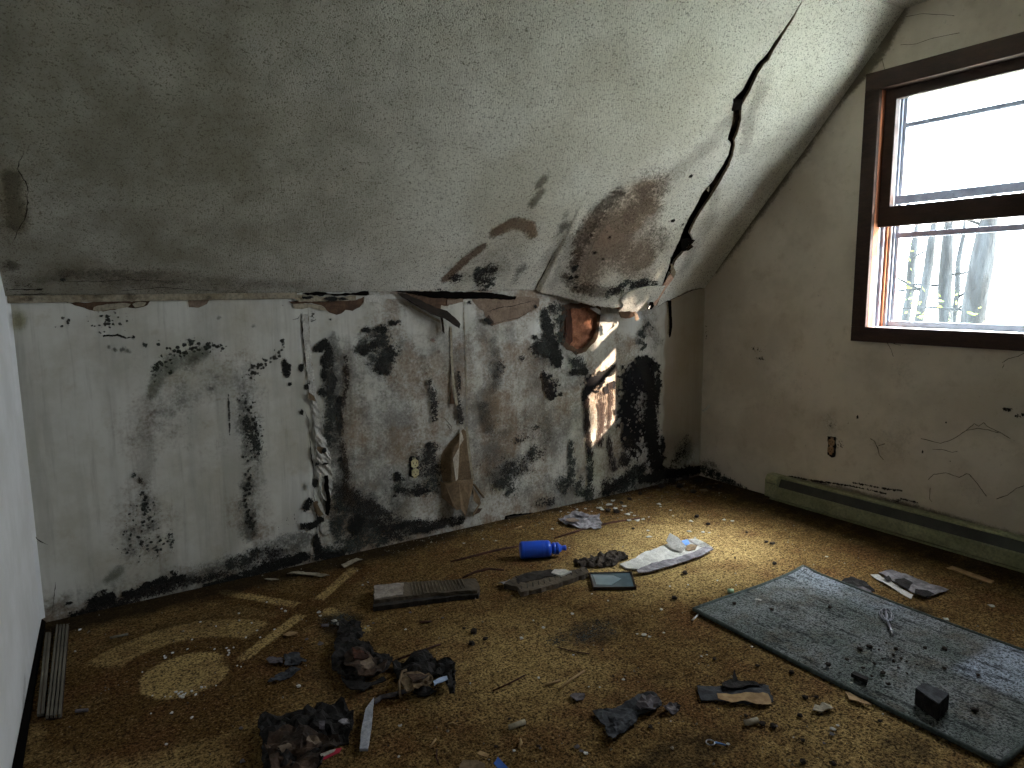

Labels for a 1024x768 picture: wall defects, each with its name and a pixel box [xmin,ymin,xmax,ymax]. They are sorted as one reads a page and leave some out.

water stain [529,176,547,207]
crack [654,2,802,337]
water stain [435,217,537,291]
water stain [569,170,672,300]
spalling [289,291,539,326]
mould [490,337,507,388]
mould [519,301,747,507]
mould [66,313,466,617]
mould [477,424,546,496]